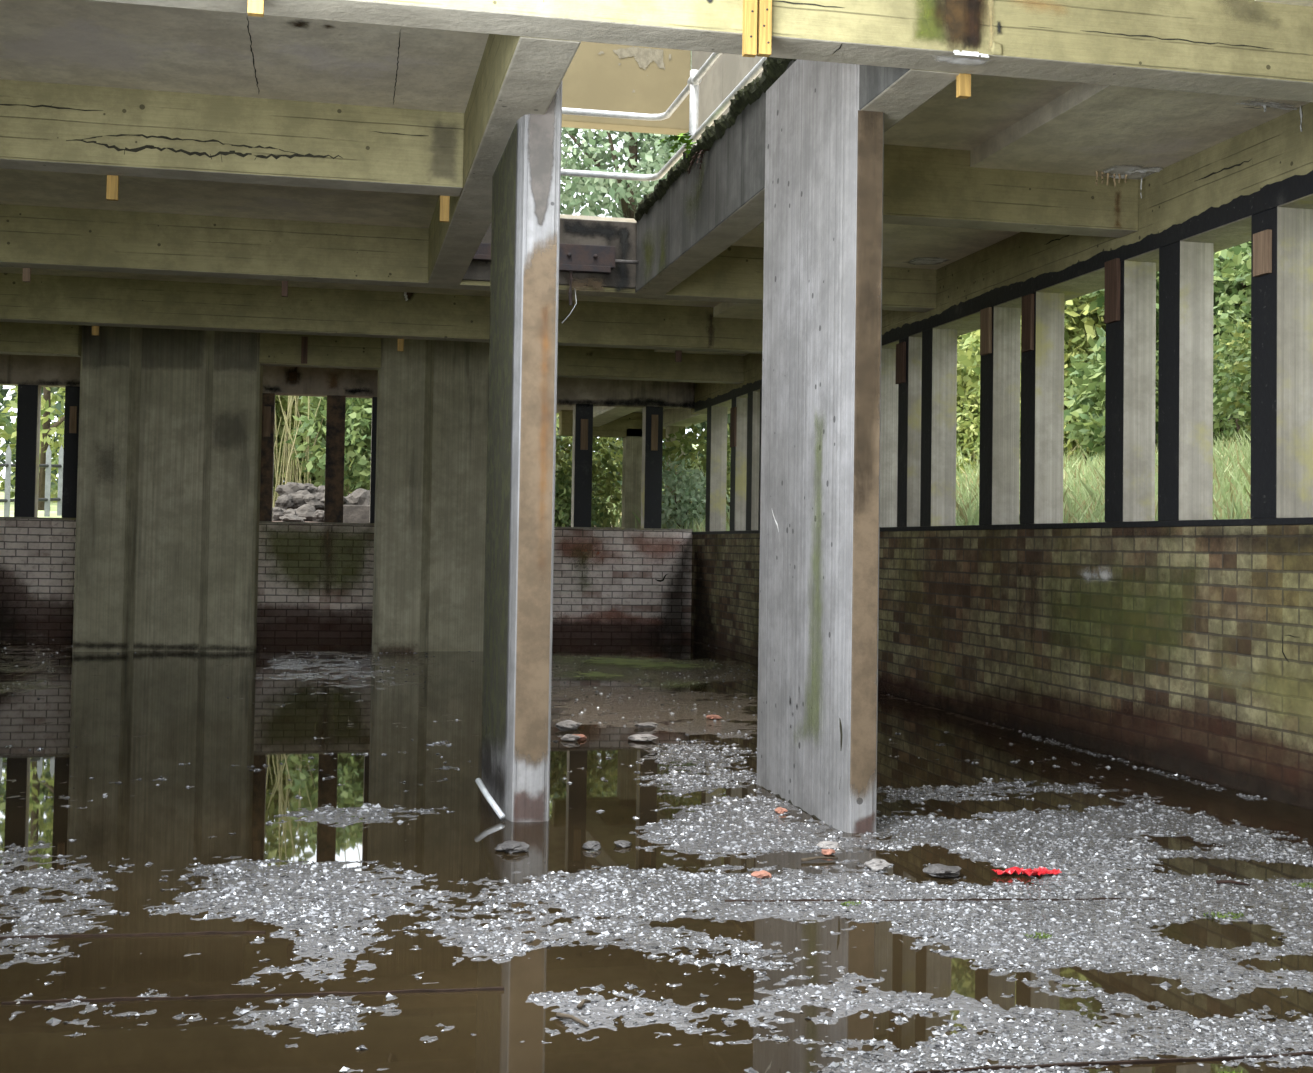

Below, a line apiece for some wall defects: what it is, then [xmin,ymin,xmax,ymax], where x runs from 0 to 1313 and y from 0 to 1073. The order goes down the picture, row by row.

water stain [916,0,989,65]
corrosion [936,0,993,48]
crack [0,104,342,159]
water stain [552,550,714,644]
water stain [878,672,1313,810]